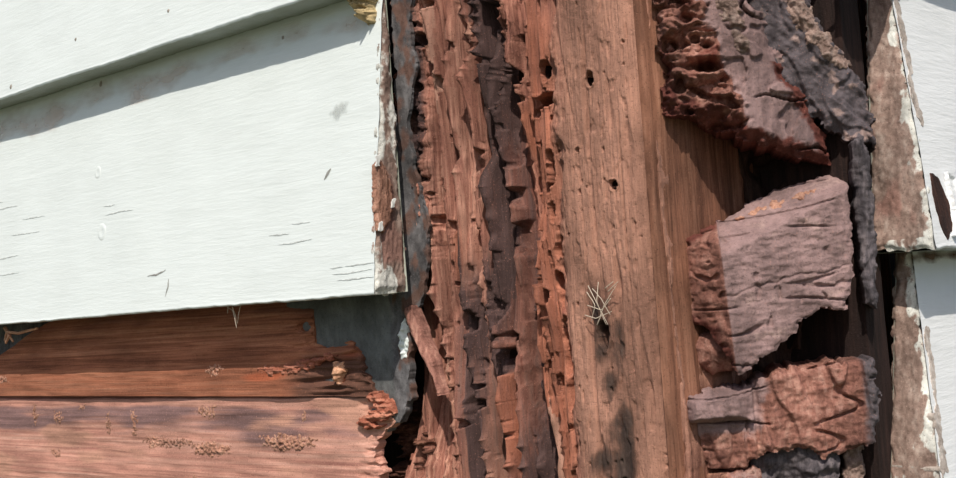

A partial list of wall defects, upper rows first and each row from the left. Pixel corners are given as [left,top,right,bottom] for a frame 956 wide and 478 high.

peeling [891,0,924,127]
peeling [371,154,396,233]